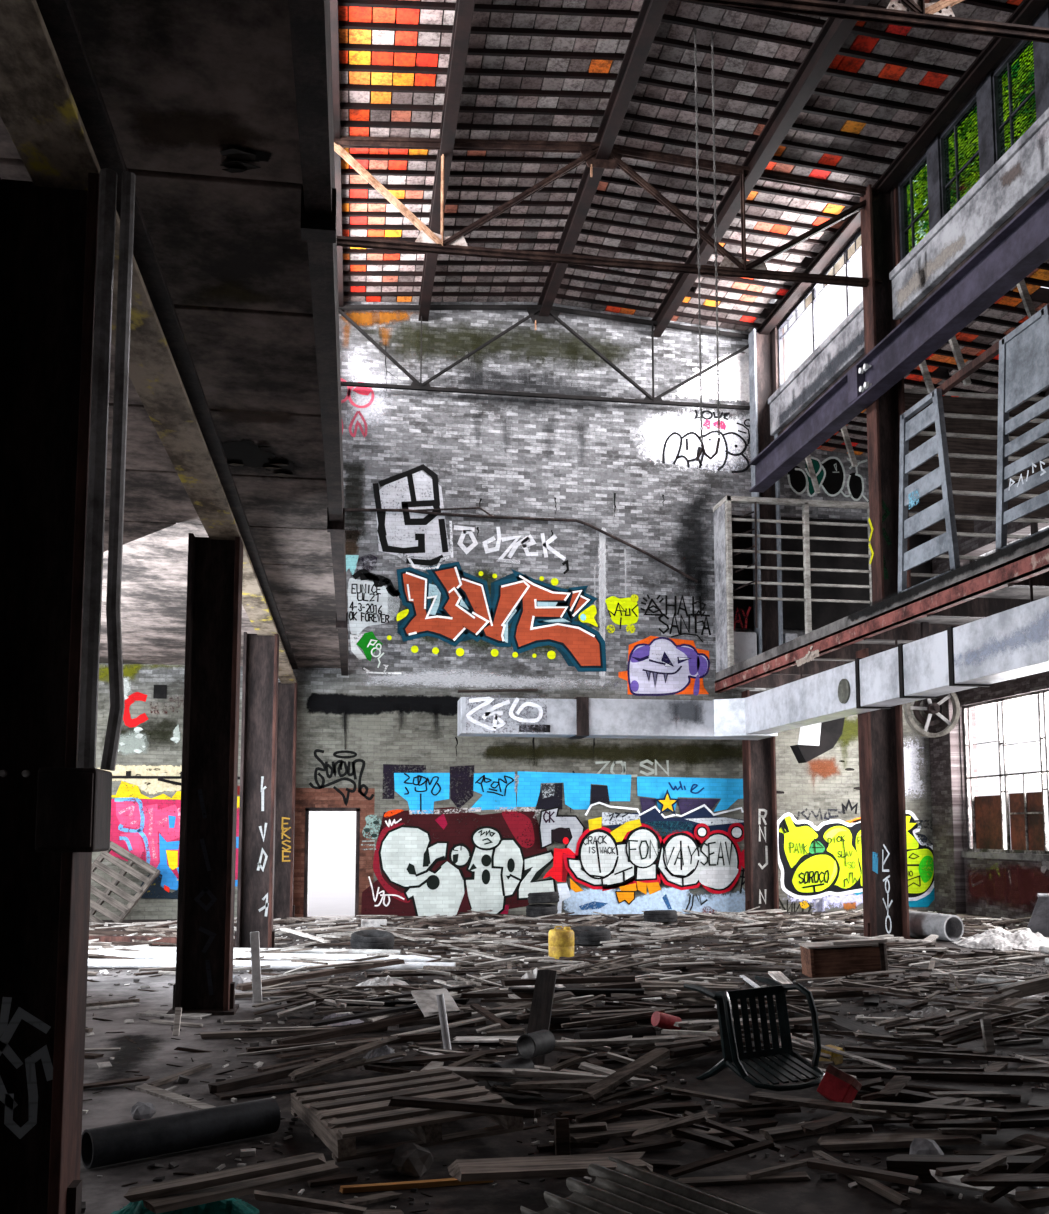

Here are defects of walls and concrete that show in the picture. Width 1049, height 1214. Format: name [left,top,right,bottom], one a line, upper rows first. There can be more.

damp [351,358,384,425]
damp [364,323,629,410]
damp [598,527,607,643]
damp [676,496,707,605]
damp [306,671,605,727]